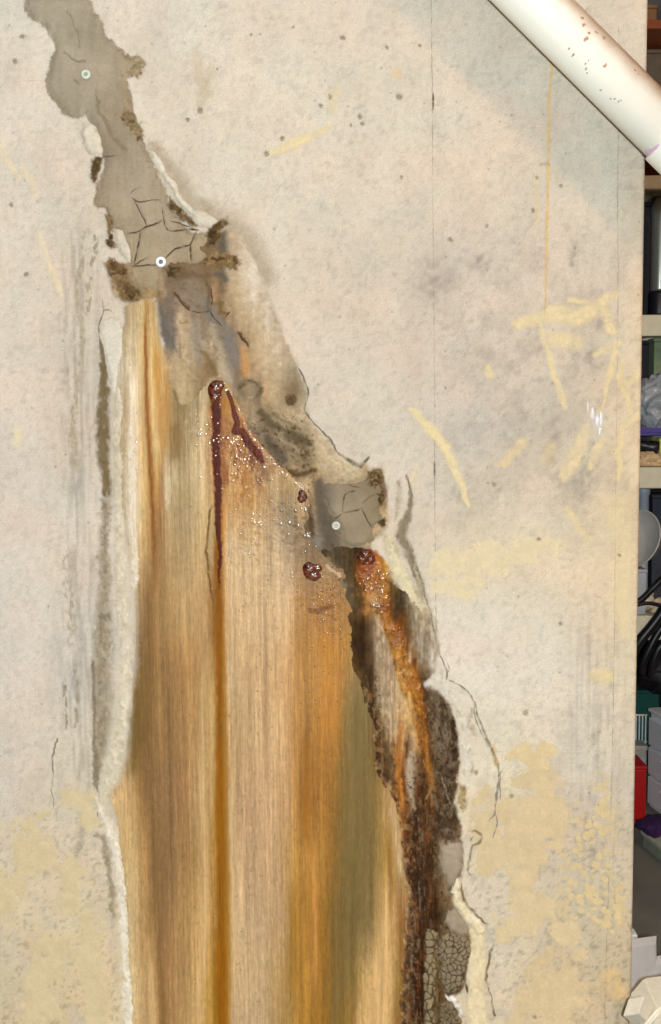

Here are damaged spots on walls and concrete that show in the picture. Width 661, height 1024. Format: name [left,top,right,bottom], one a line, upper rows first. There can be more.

spalling [124,53,146,80]
peeling [80,122,104,183]
spalling [105,212,142,302]
crack [129,187,200,267]
spalling [165,264,184,278]
spalling [115,107,241,271]
peeling [99,317,124,393]
crack [298,368,376,527]
spalling [366,469,388,528]
corrosion [105,299,435,1024]
crack [406,539,501,1018]
peeling [450,877,491,1024]